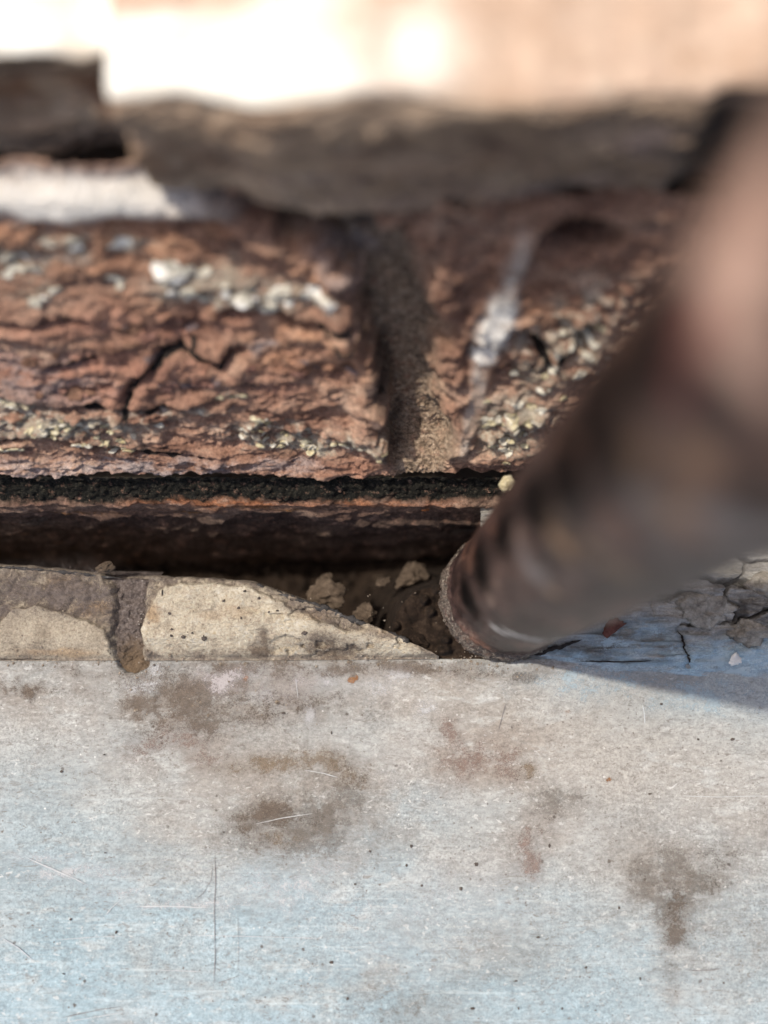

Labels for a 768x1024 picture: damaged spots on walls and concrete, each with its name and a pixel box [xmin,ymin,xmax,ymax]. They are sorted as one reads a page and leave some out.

spalling [0,570,163,673]
efflorescence [202,667,246,693]
water stain [259,678,341,723]
water stain [237,800,296,833]
water stain [664,892,686,946]